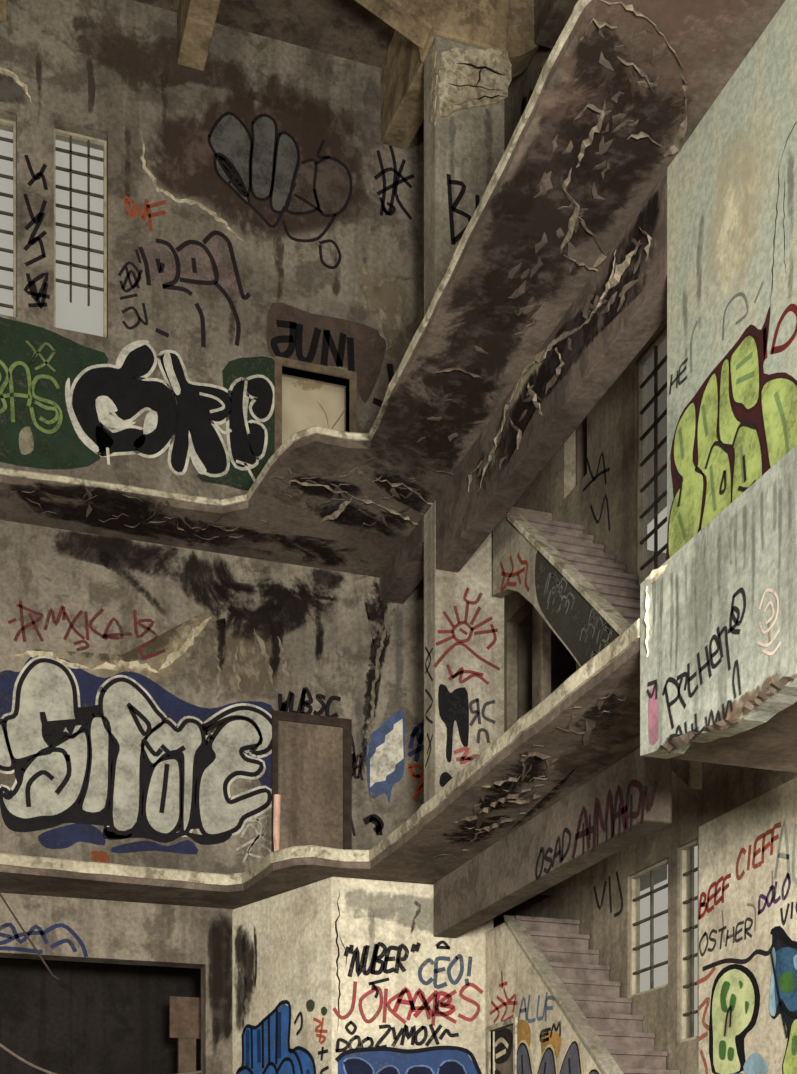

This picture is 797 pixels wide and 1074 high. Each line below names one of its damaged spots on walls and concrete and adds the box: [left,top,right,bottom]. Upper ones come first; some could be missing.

crack [449,63,505,100]
peeling [417,0,689,496]
peeling [78,487,244,540]
peeling [291,474,433,535]
damp [12,482,348,675]
peeling [553,690,626,747]
peeling [424,745,558,863]
damp [208,916,257,1048]